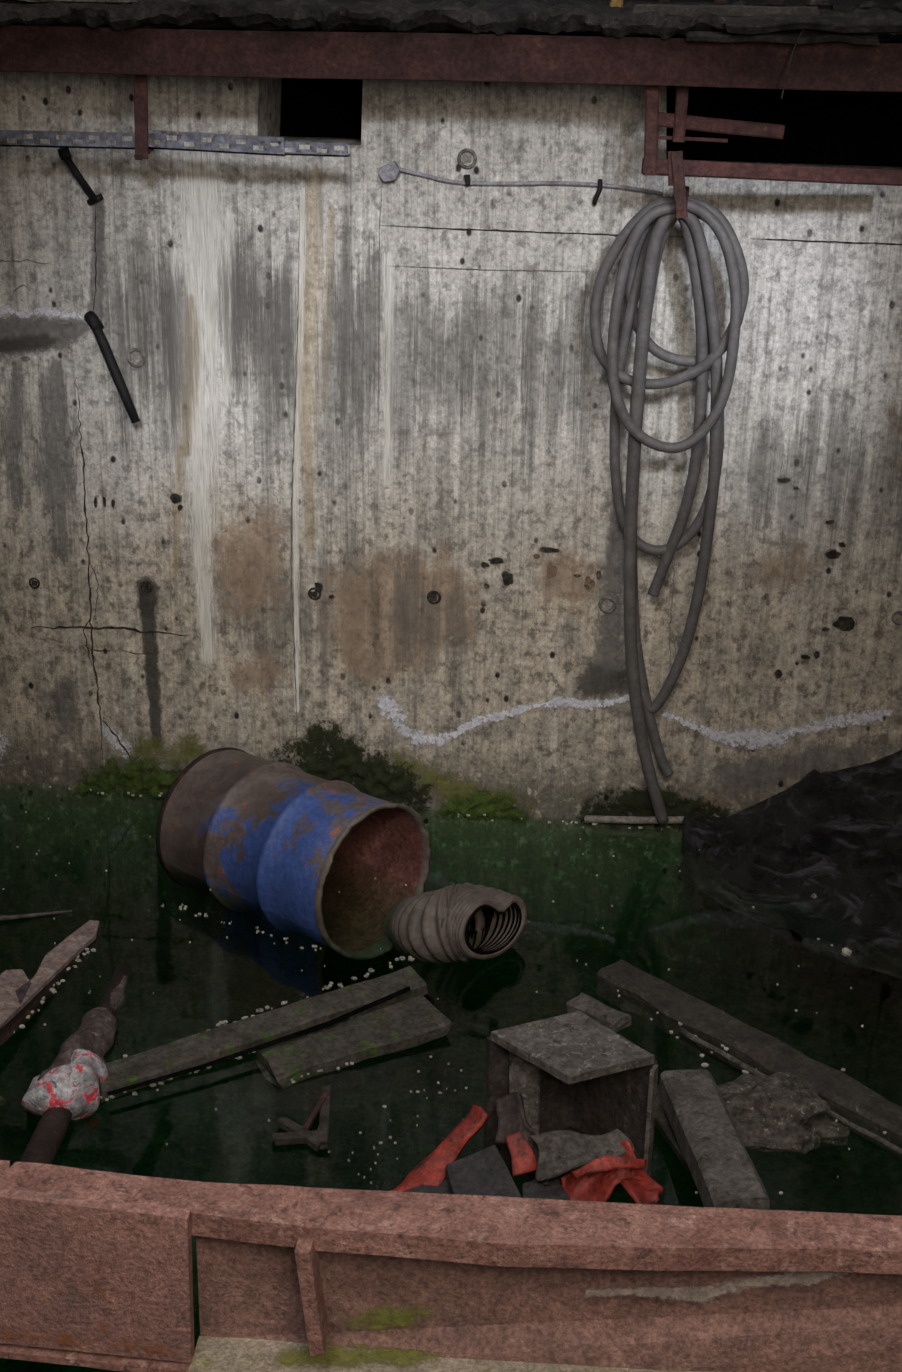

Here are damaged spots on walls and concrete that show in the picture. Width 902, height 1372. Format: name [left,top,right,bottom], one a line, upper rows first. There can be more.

water stain [169,151,236,663]
water stain [293,187,306,712]
water stain [382,253,396,485]
water stain [102,724,132,759]
water stain [136,576,161,748]
water stain [375,502,630,746]